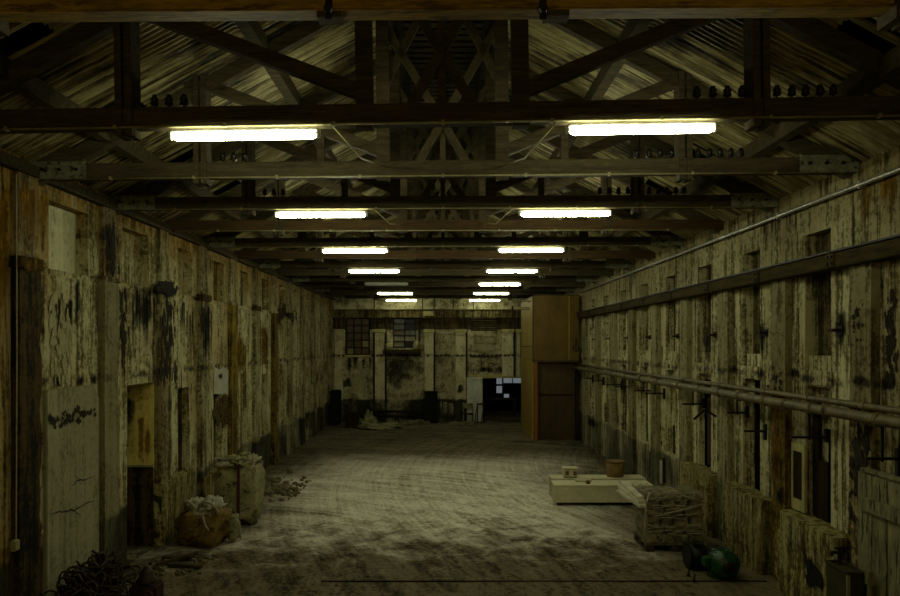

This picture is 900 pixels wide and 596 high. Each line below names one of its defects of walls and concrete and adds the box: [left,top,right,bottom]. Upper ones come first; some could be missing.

water stain [132,285,155,332]
spalling [49,405,97,429]
crack [50,475,95,514]